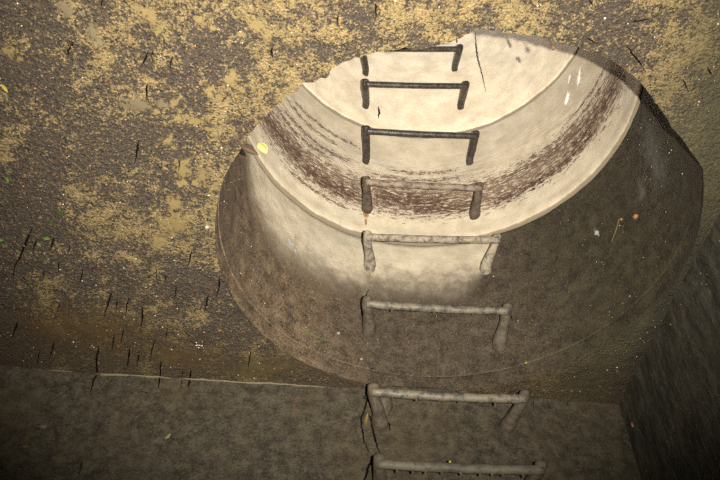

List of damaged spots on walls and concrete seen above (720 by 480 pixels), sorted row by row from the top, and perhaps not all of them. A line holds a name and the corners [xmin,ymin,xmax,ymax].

crack [475,33,486,91]
crack [13,227,70,278]
crack [89,291,167,396]
crack [360,395,390,480]